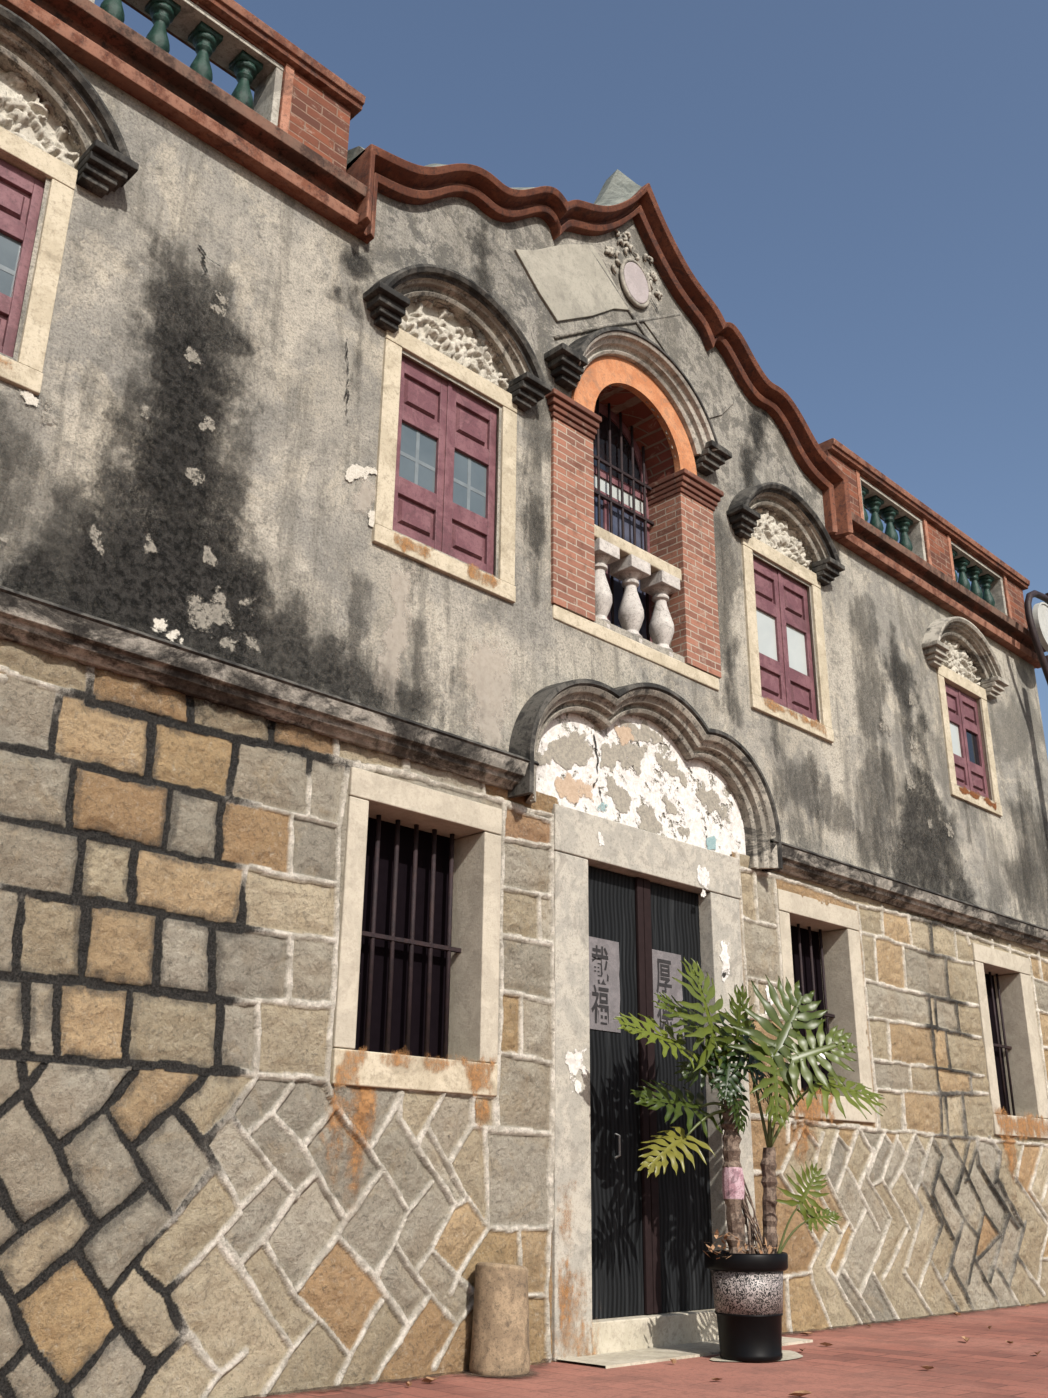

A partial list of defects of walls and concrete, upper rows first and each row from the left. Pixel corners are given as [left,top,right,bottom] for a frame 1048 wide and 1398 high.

spalling [184,347,201,364]
spalling [203,546,217,566]
water stain [0,237,444,726]
flaking render [345,464,377,527]
water stain [522,498,545,550]
spalling [152,586,260,651]
water stain [940,625,996,682]
water stain [452,514,975,904]
peeling [536,713,746,897]
water stain [1006,782,1048,926]
corrosion [327,1049,376,1189]
corrosion [425,1057,494,1120]